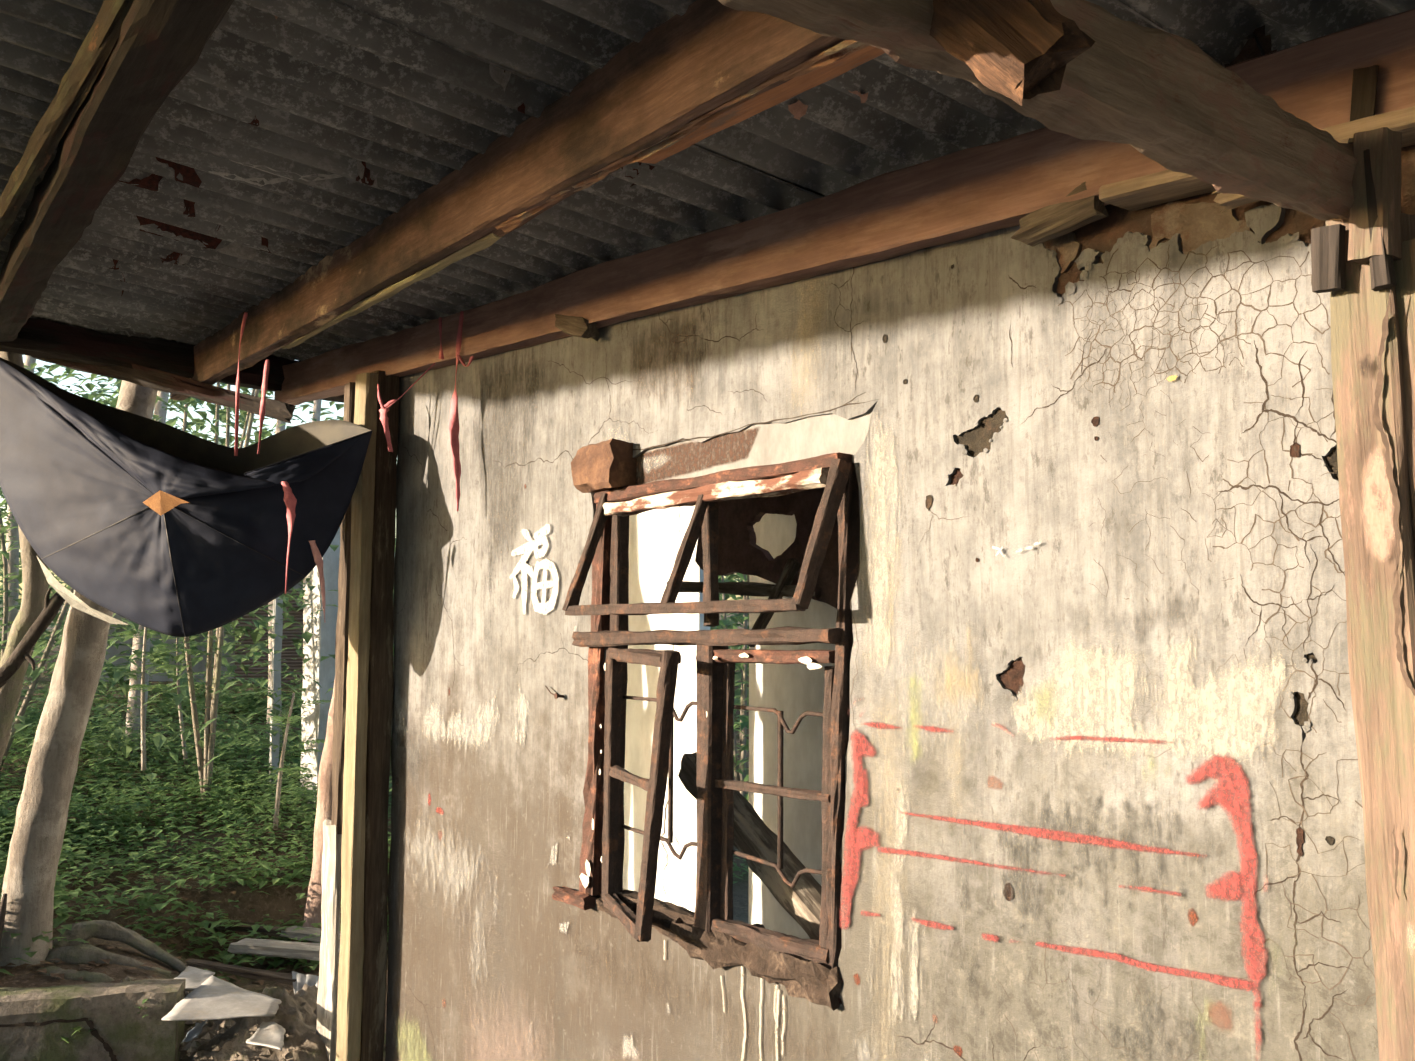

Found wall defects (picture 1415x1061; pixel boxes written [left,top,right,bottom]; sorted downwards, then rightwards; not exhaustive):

flaking render [1225,25,1277,67]
flaking render [1401,145,1415,215]
flaking render [1043,192,1326,304]
spalling [945,408,1008,486]
spalling [1322,447,1338,480]
peeling [999,640,1311,765]
crack [1008,245,1399,1061]
crack [854,947,1234,1061]